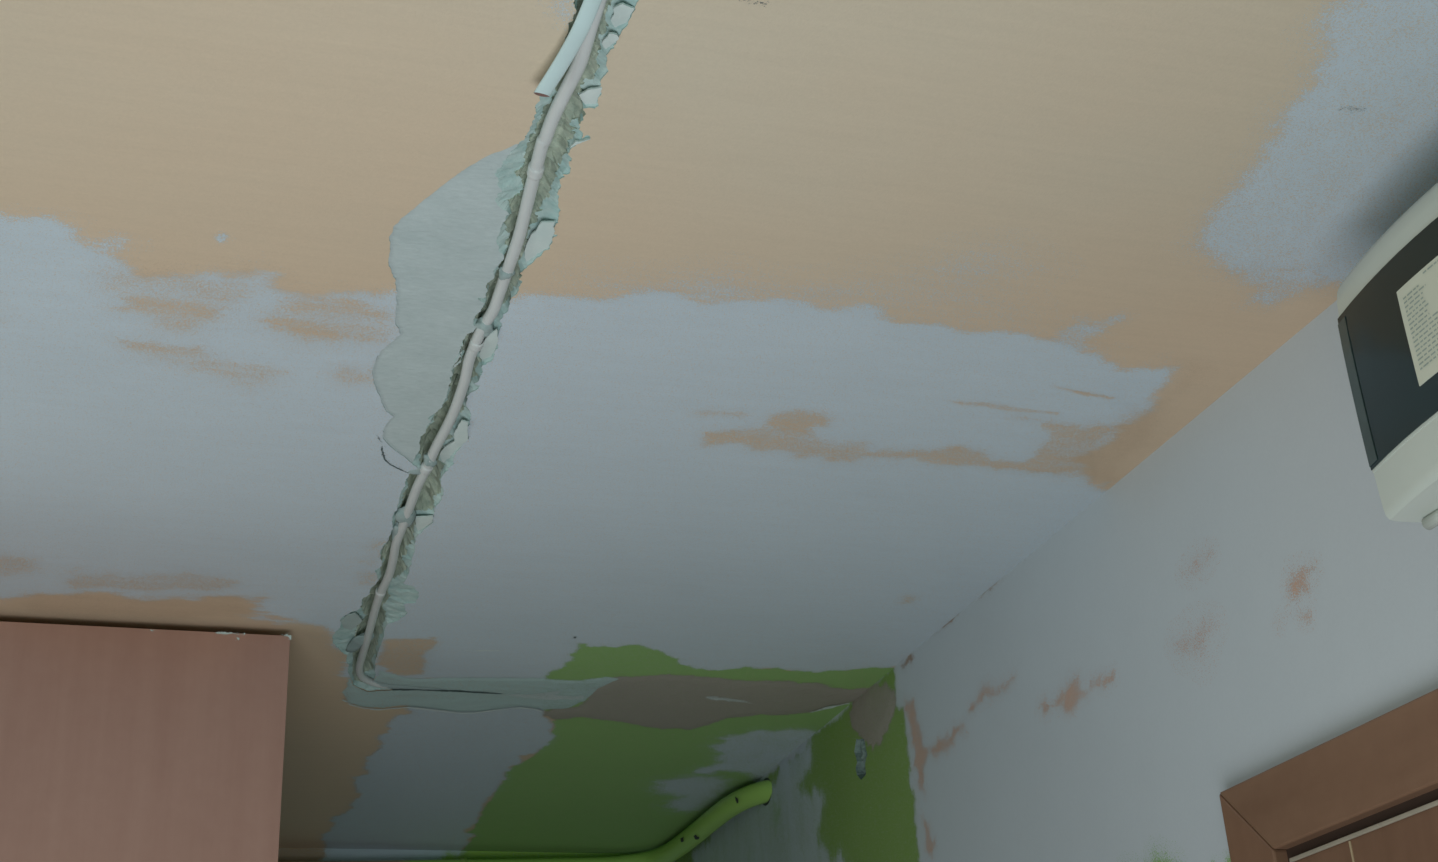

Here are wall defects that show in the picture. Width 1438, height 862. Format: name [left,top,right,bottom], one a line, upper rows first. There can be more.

peeling [332,0,639,691]